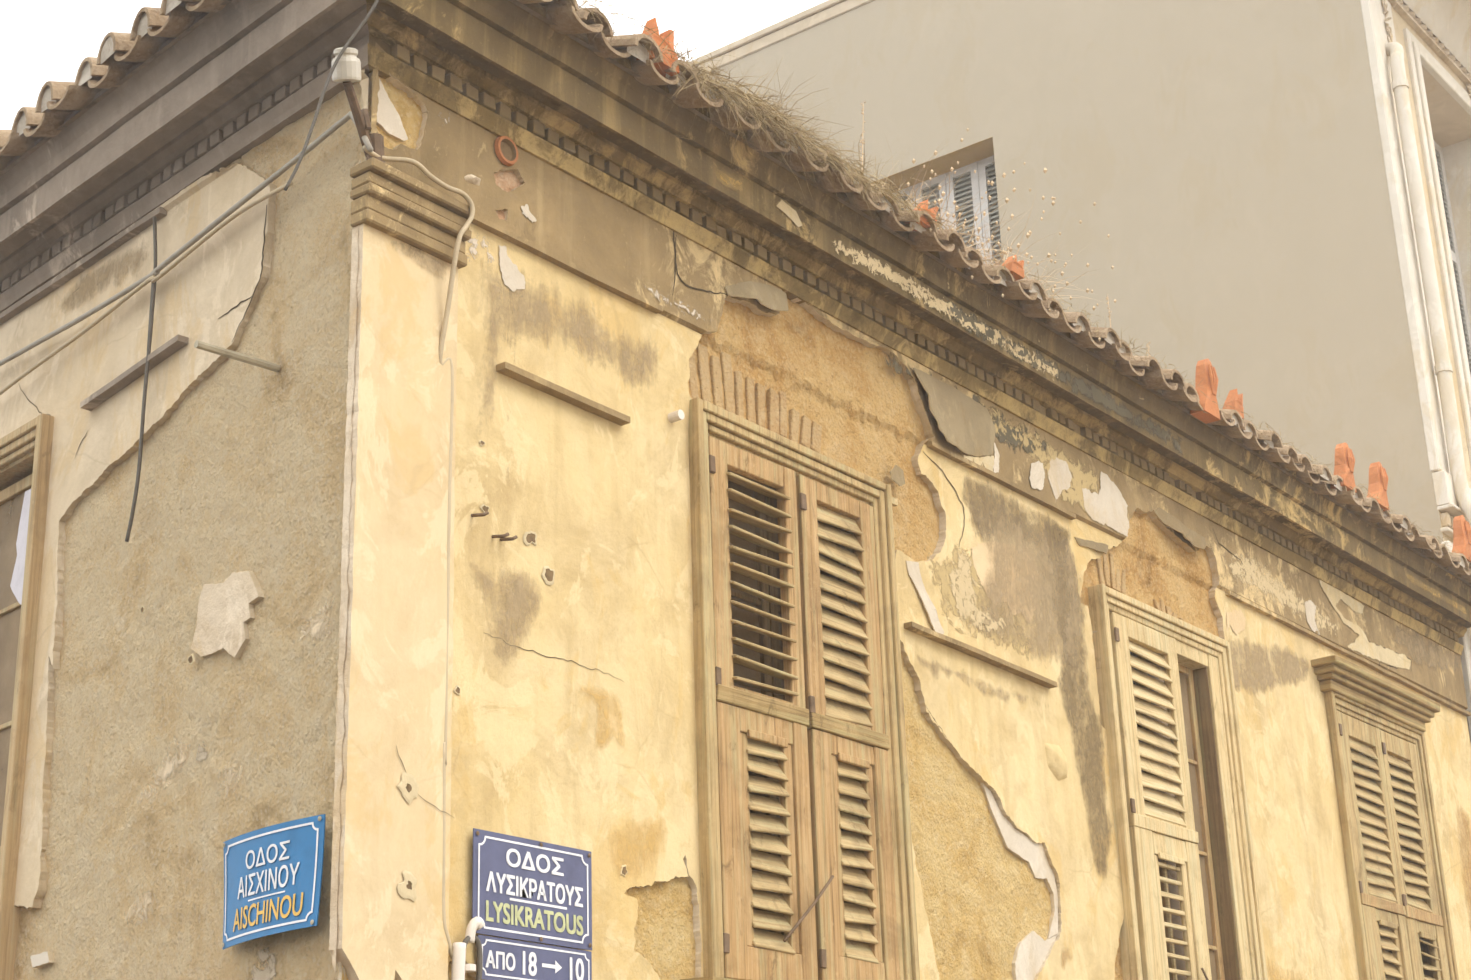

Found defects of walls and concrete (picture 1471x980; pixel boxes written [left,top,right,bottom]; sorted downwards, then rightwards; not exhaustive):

crack [218,205,267,341]
peeling [468,237,526,292]
water stain [491,280,654,381]
peeling [776,200,802,227]
peeling [833,240,1058,381]
spalling [14,72,450,980]
spalling [648,281,1411,670]
water stain [964,479,1110,873]
water stain [1231,642,1308,691]
spalling [900,640,1062,980]
spalling [449,961,483,980]
spalling [620,856,702,980]